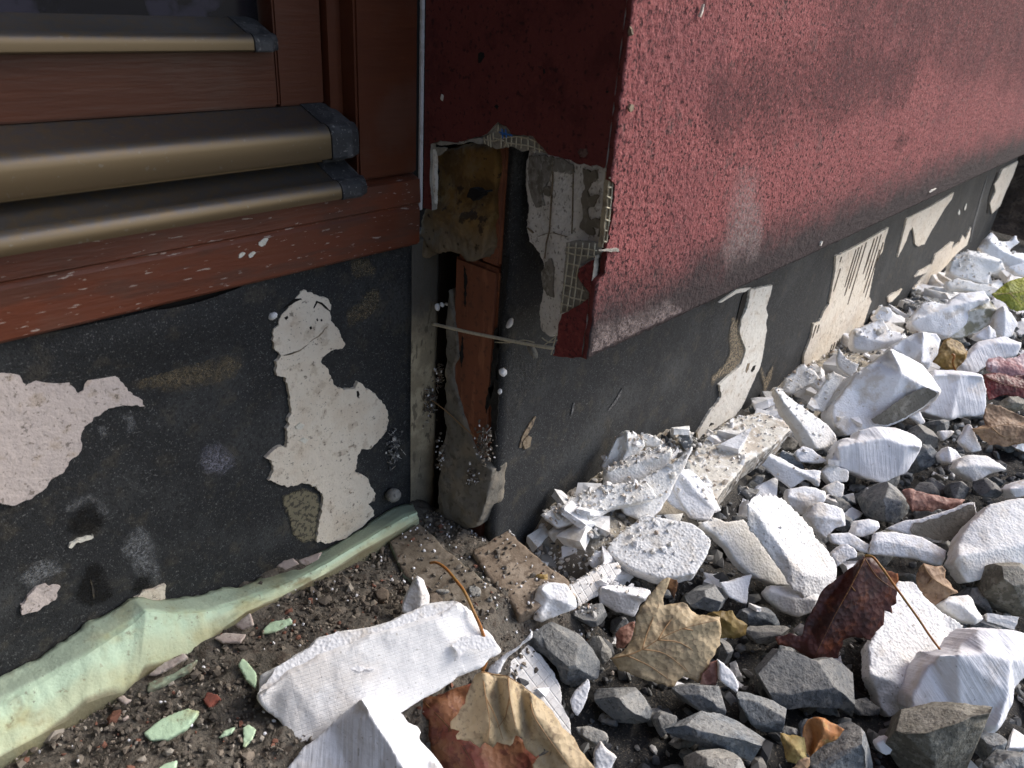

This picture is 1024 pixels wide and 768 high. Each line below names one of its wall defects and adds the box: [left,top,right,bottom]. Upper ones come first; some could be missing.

spalling [527,154,601,297]
peeling [696,284,772,439]
peeling [802,227,889,366]
peeling [896,188,954,257]
peeling [887,227,971,303]
peeling [989,161,1018,214]
peeling [0,373,144,506]
peeling [264,289,389,570]
peeling [20,583,60,615]